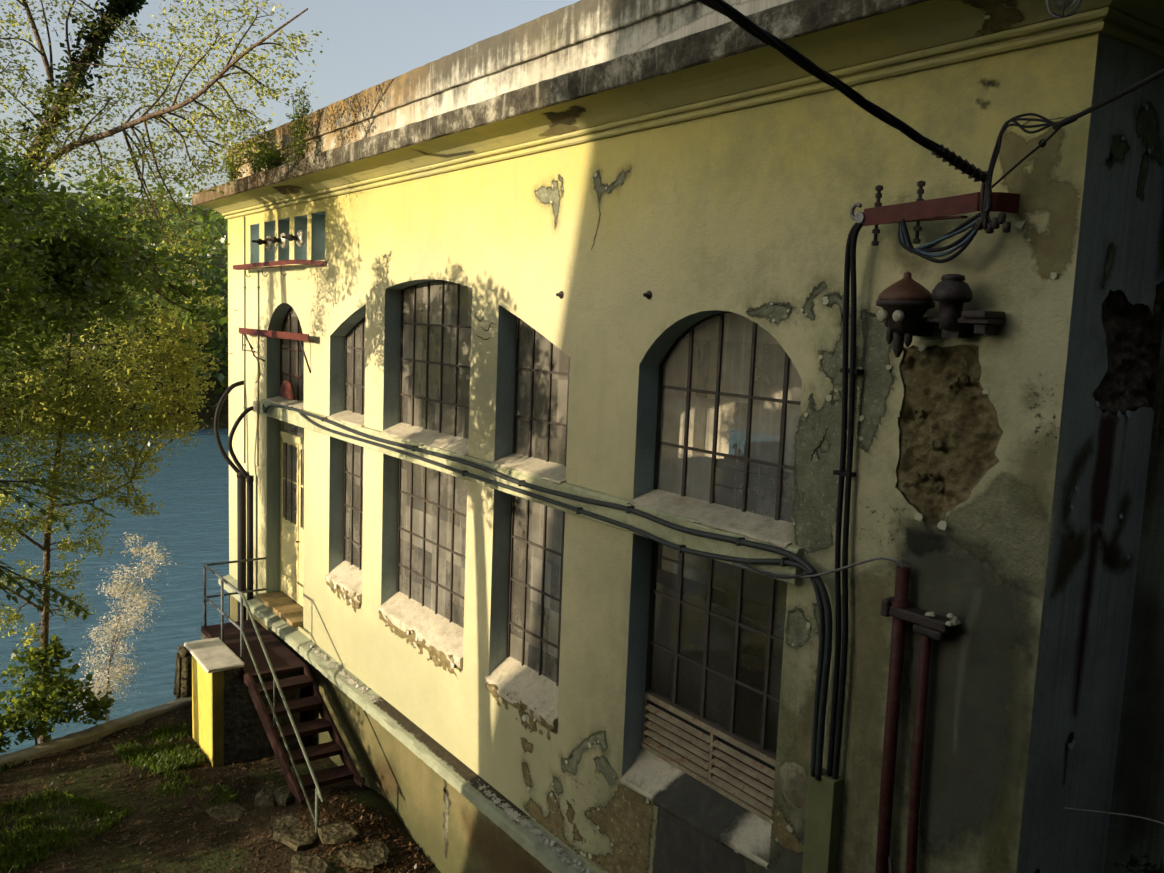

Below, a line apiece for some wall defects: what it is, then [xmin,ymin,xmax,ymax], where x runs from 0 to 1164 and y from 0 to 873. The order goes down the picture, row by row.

leakage [639,0,793,51]
peeling [959,0,1024,35]
leakage [538,106,586,136]
leakage [412,149,475,158]
peeling [1105,100,1162,202]
peeling [534,174,564,227]
peeling [593,169,631,202]
flaking render [1092,242,1164,418]
flaking render [746,281,1003,555]
leakage [859,499,1035,857]
peeling [467,731,654,873]